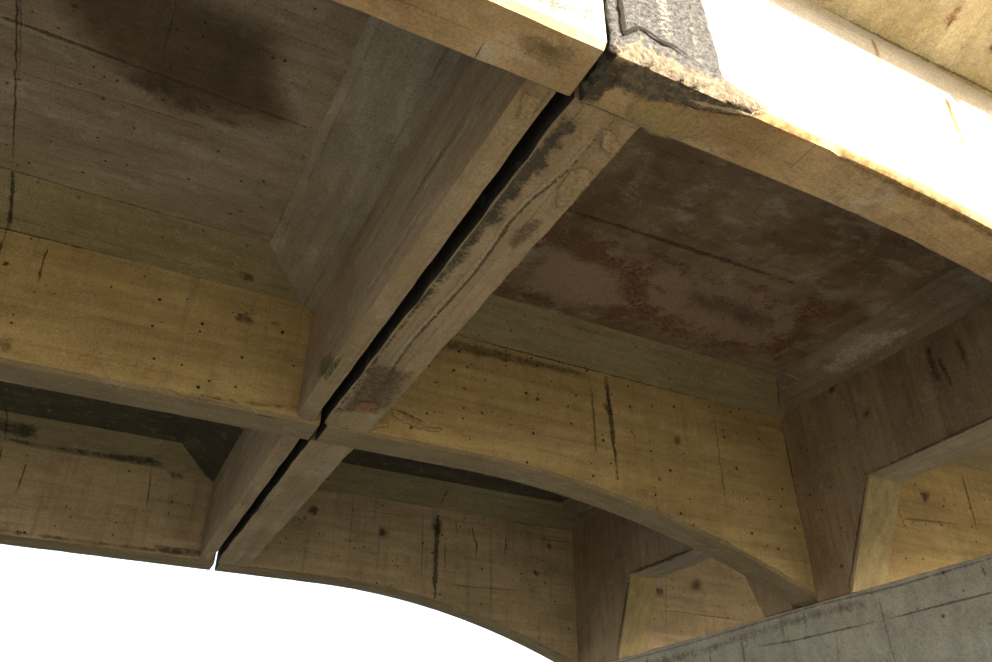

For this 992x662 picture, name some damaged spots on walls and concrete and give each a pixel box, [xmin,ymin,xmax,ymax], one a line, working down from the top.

damp [74,0,277,114]
crack [0,0,22,249]
rust [946,99,965,144]
damp [78,450,157,466]